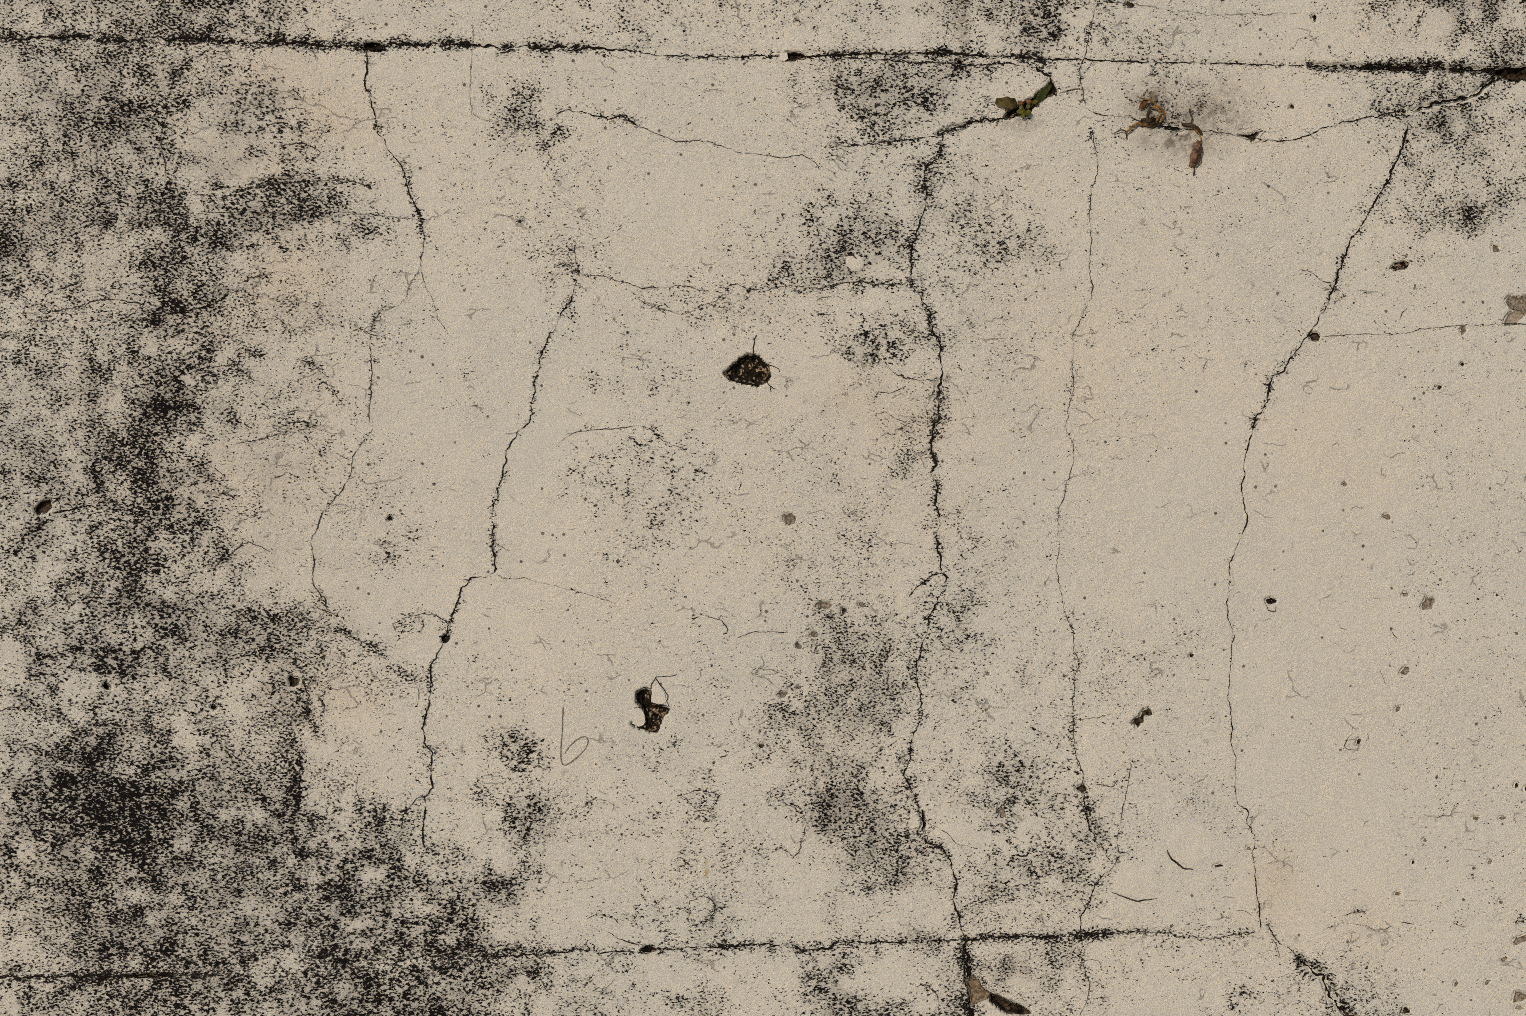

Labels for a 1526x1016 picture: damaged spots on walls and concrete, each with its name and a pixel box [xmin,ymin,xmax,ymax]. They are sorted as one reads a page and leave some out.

leakage [479,73,585,163]
leakage [1336,0,1526,241]
crack [0,33,780,614]
spalling [724,335,780,392]
peeling [1504,295,1526,325]
leakage [0,0,554,1016]
crack [392,0,1525,1016]
spalling [630,674,677,732]
leakage [746,608,924,896]
spalling [965,977,989,1007]